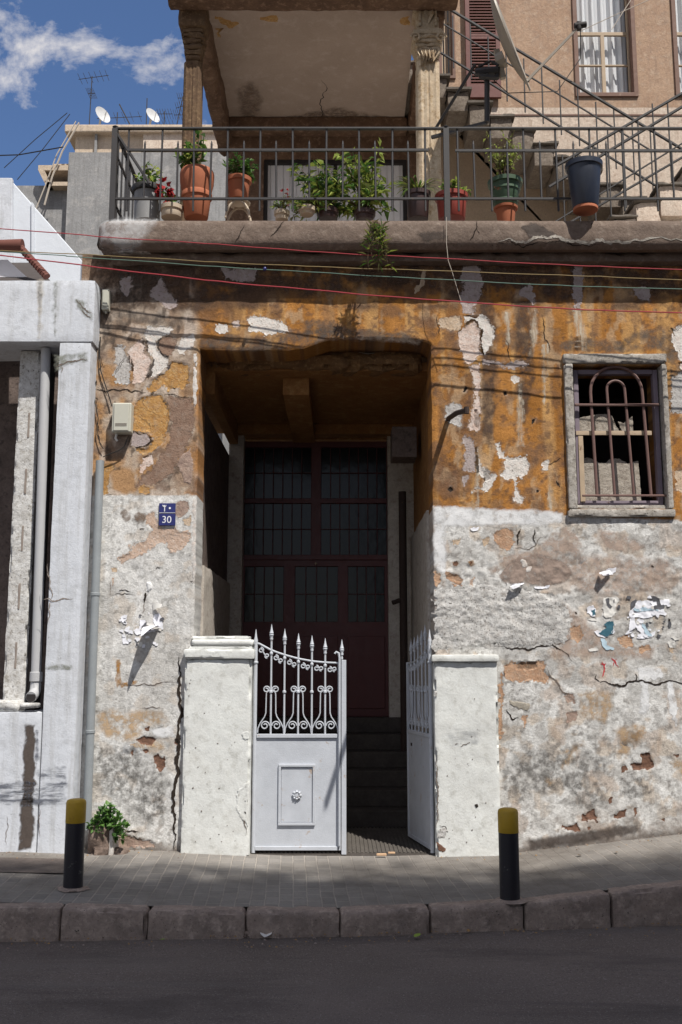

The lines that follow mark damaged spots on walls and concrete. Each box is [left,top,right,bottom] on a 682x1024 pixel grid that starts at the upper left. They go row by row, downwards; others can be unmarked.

spalling [112,325,198,495]
peeling [436,265,559,504]
peeling [433,571,475,591]
spalling [482,527,578,586]
spalling [503,625,611,723]
crack [595,674,682,687]
peeling [100,711,178,772]
crack [118,660,184,847]
spalling [617,725,654,773]
damp [0,725,66,850]
spalling [562,809,598,832]
spalling [608,797,637,819]